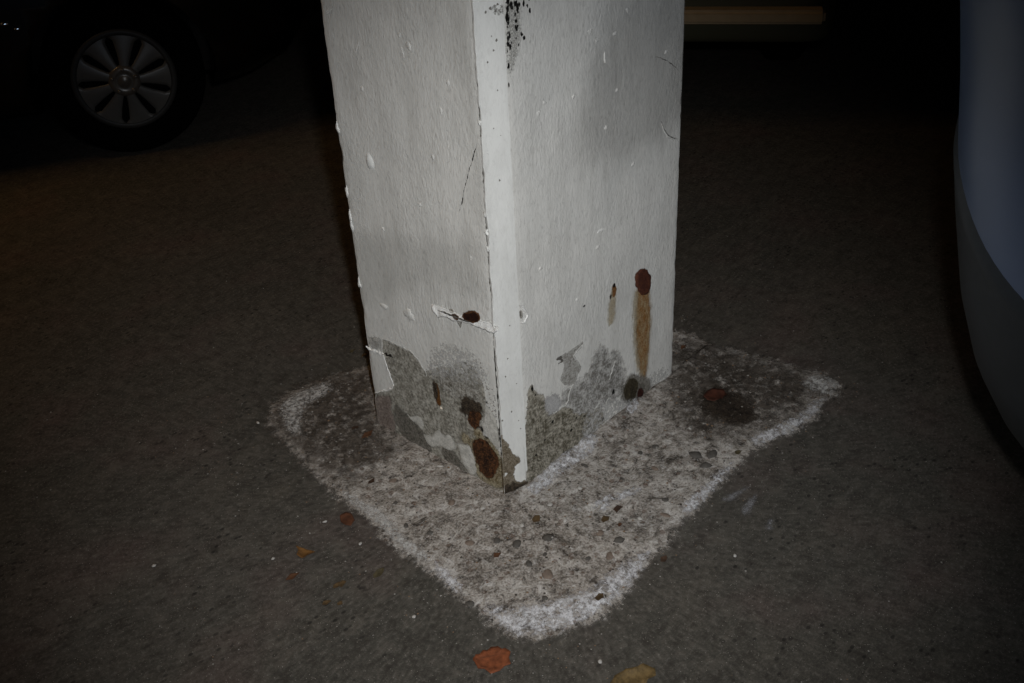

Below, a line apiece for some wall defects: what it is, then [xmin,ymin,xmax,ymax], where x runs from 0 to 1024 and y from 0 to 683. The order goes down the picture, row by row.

leakage [505,0,531,70]
corrosion [609,283,617,325]
corrosion [621,268,651,403]
leakage [280,383,333,434]
peeling [375,339,500,479]
corrosion [460,397,503,488]
leakage [501,398,639,494]
peeling [525,342,626,482]
leakage [699,386,757,424]
leakage [753,375,837,445]
leakage [343,491,463,593]
leakage [486,551,649,635]